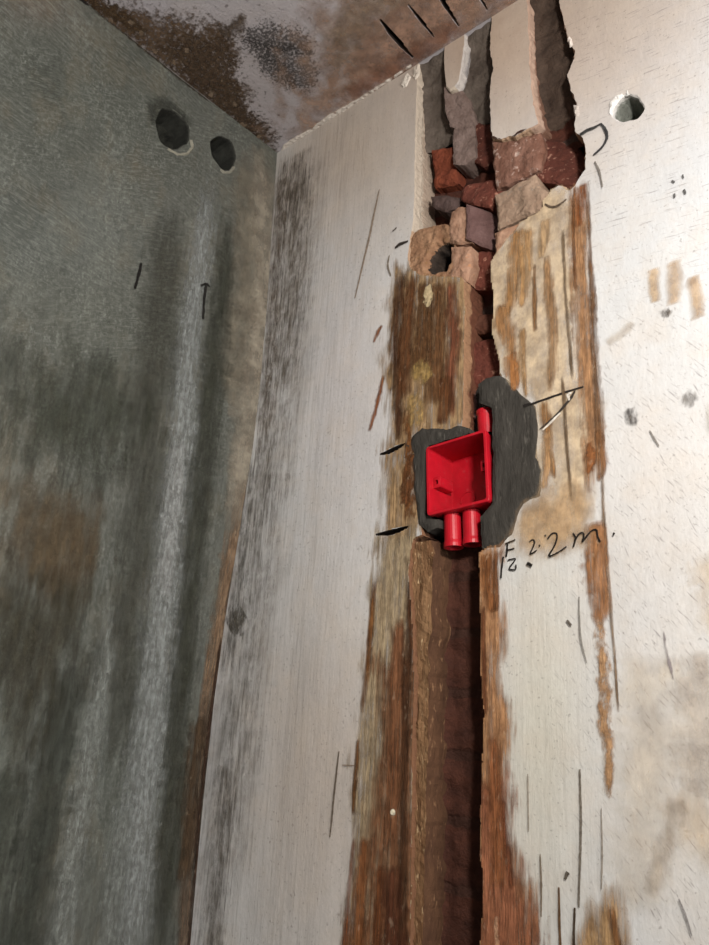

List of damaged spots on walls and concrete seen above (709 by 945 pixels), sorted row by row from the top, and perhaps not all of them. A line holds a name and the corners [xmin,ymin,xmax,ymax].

mould [85,0,282,152]
water stain [298,0,515,131]
spalling [408,87,586,297]
flaking render [608,90,630,115]
water stain [0,155,307,945]
rust [342,264,466,945]
rust [491,184,619,794]
rust [479,545,539,945]
rust [578,893,629,945]